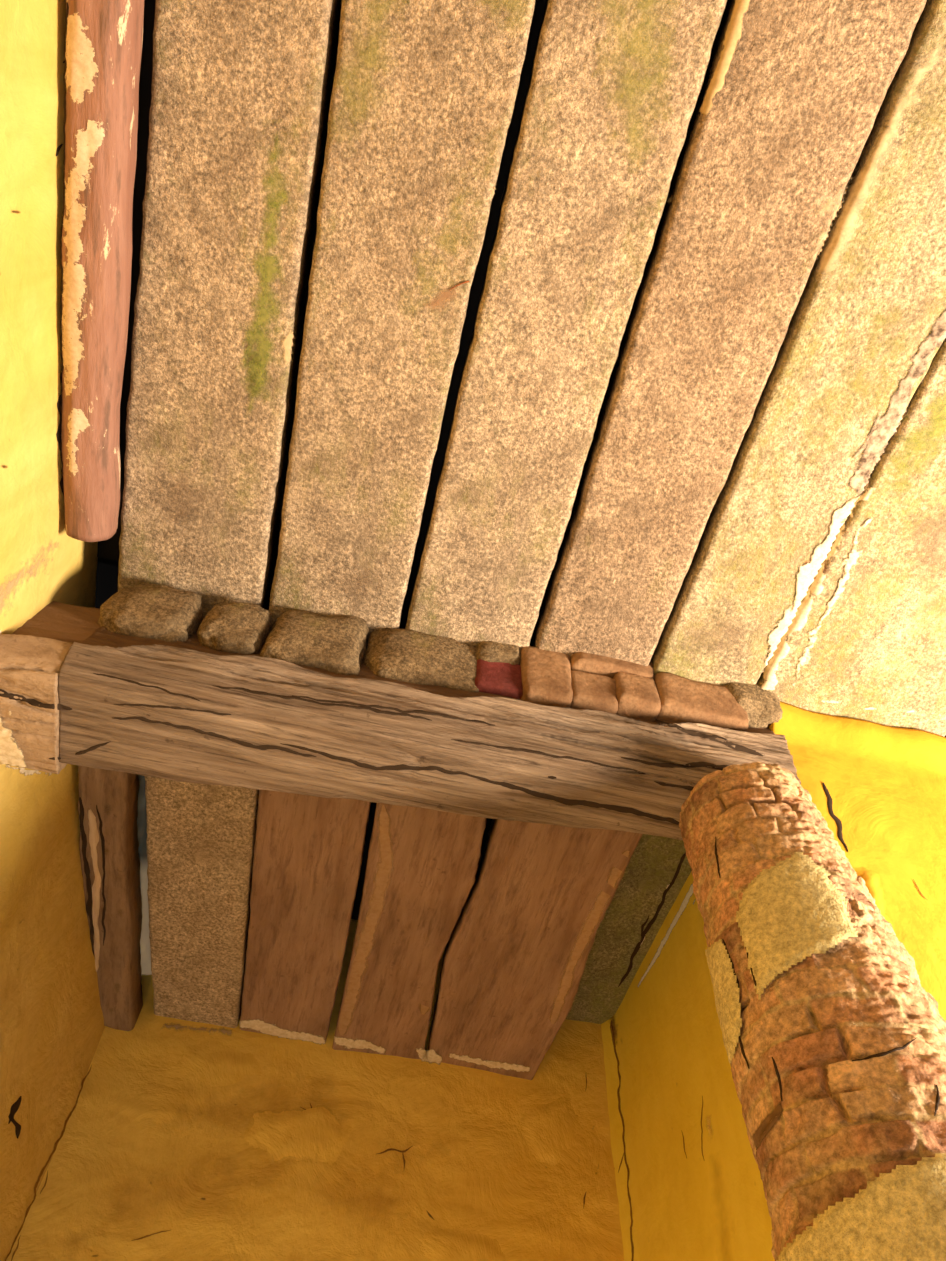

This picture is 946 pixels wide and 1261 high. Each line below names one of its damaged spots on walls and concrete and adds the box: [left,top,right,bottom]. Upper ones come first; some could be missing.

peeling [65,12,99,104]
peeling [61,120,108,476]
crack [0,689,72,710]
crack [49,673,763,825]
crack [739,1036,783,1101]
crack [852,1038,916,1061]
crack [610,1021,634,1261]